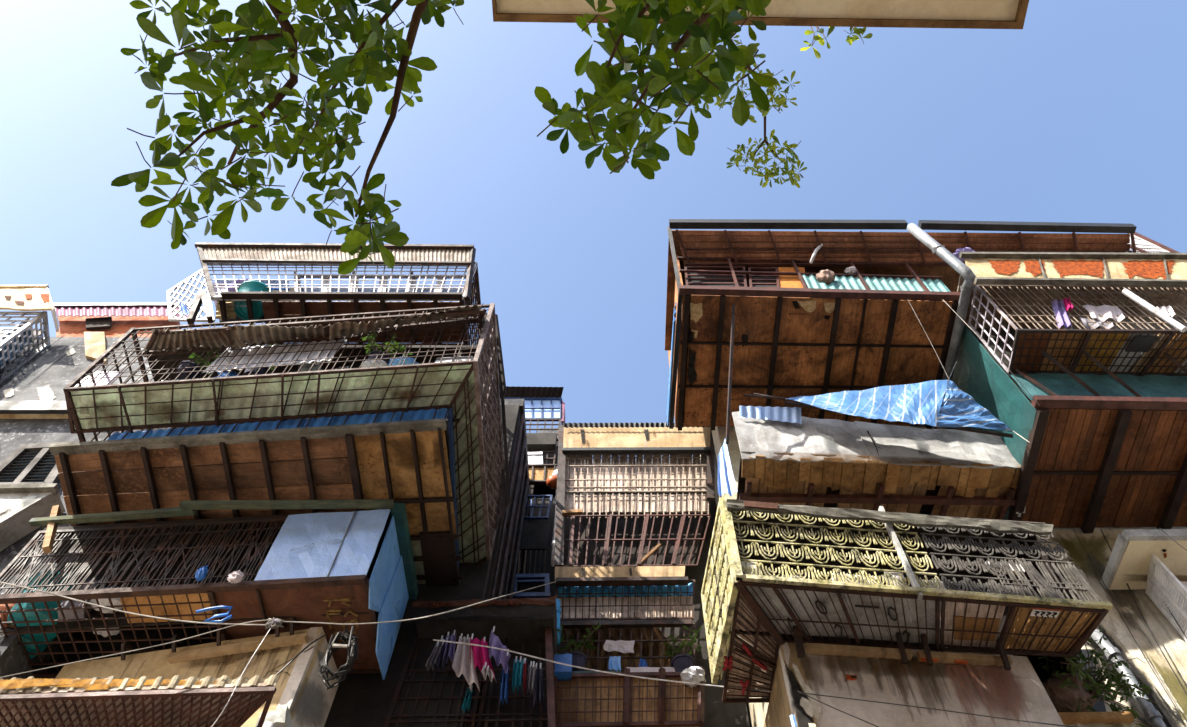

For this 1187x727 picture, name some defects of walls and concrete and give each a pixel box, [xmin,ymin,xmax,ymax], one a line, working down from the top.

water stain [837,656,1017,710]